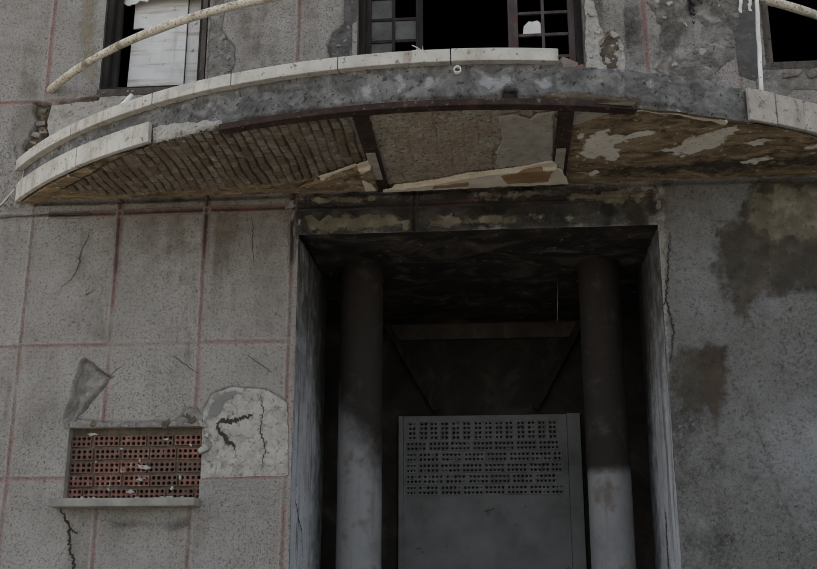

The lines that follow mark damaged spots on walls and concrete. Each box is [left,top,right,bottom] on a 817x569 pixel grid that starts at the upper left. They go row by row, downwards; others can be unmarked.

spalling [327,0,358,58]
peeling [584,0,626,70]
peeling [646,0,752,82]
peeling [25,95,145,152]
peeling [539,92,740,163]
spalling [64,110,649,248]
water stain [597,154,817,177]
water stain [711,181,817,314]
crack [661,234,675,363]
water stain [671,344,729,414]
spalling [64,361,289,478]
crack [60,509,78,569]